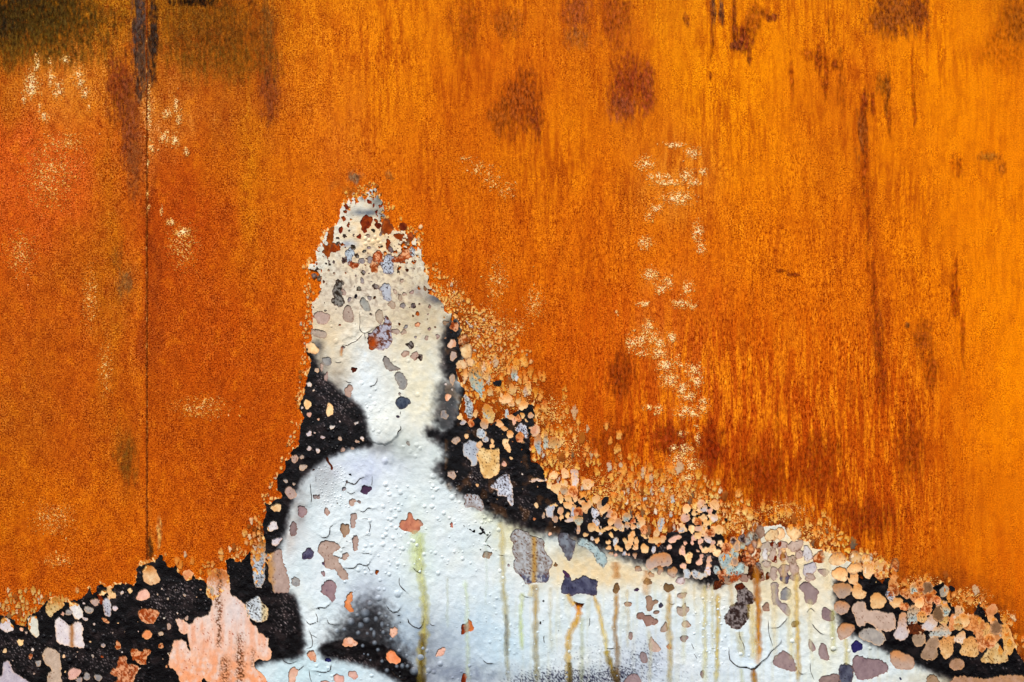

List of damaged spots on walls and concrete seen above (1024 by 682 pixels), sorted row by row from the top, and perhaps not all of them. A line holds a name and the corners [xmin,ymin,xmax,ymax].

corrosion [710,0,777,64]
corrosion [866,0,928,40]
peeling [2,50,100,286]
peeling [144,84,190,175]
peeling [459,154,519,200]
peeling [634,141,710,255]
corrosion [858,74,891,239]
corrosion [951,259,965,363]
peeling [0,181,1024,682]
corrosion [565,595,582,682]
corrosion [594,596,619,682]
crack [691,608,835,670]